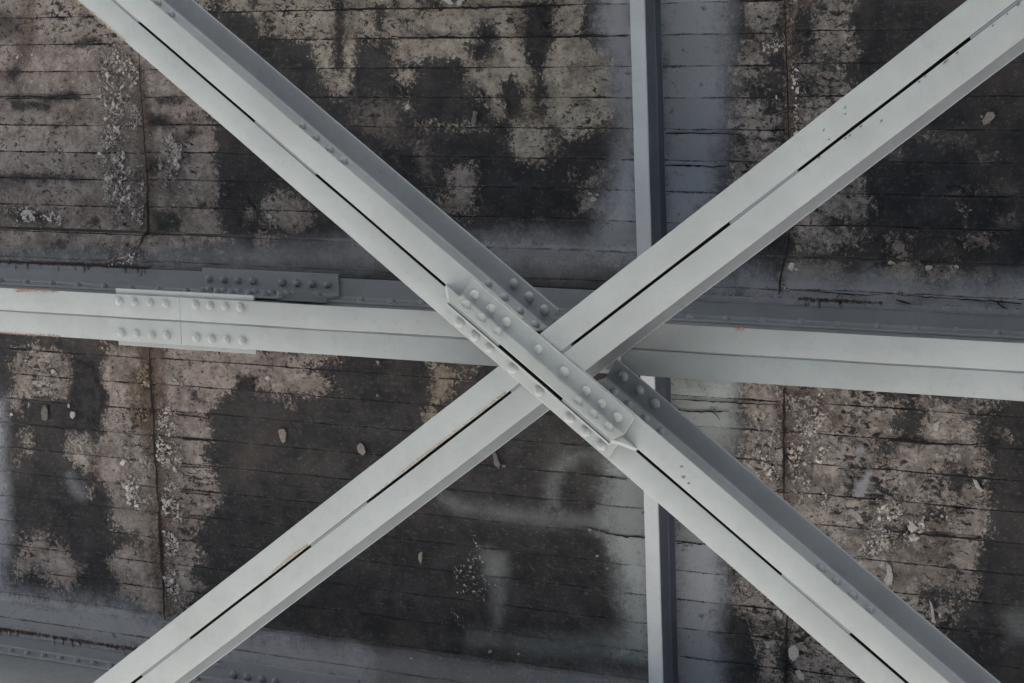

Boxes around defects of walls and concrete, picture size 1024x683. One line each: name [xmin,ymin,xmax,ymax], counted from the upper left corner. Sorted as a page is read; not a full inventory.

damp [4,200,65,228]
damp [8,92,79,113]
damp [70,37,196,235]
crack [135,54,159,255]
damp [762,0,806,135]
crack [782,0,790,137]
corrosion [798,297,883,308]
damp [66,360,106,434]
damp [119,364,188,614]
crack [141,347,214,625]
damp [752,385,840,507]
damp [856,499,929,558]